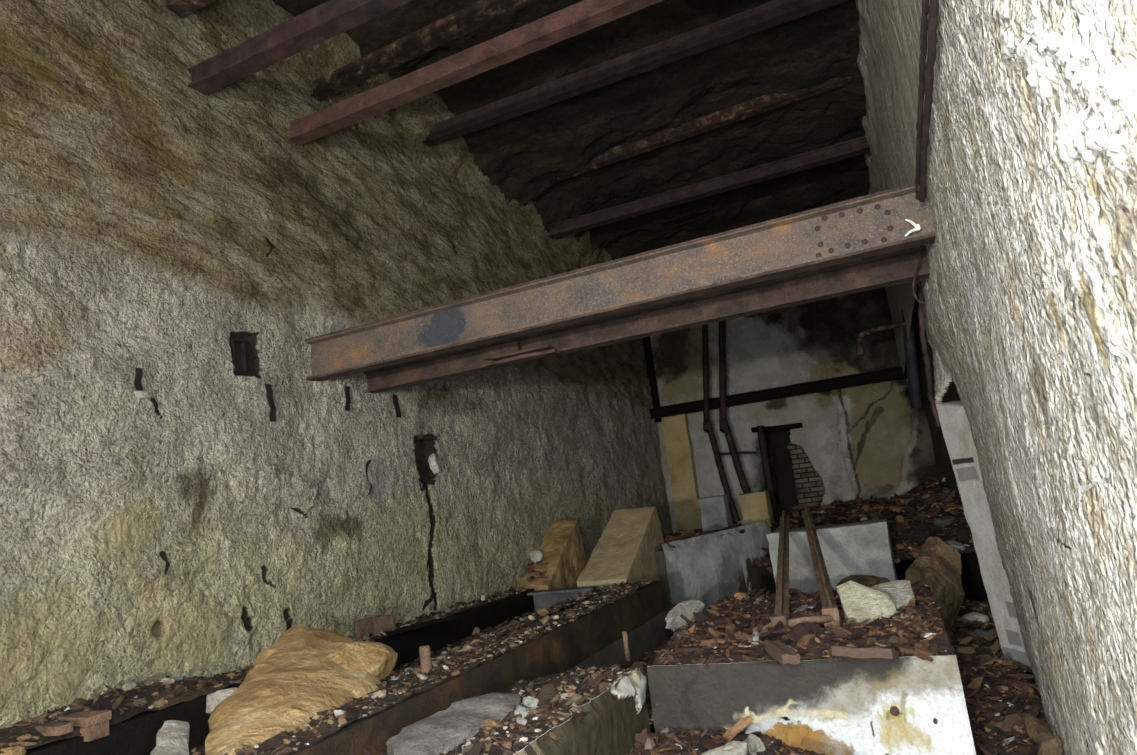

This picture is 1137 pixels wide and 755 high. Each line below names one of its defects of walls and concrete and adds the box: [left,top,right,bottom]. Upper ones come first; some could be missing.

water stain [993,0,1134,276]
peeling [726,317,817,410]
peeling [690,417,761,500]
spalling [787,381,911,507]
crack [837,380,893,499]
crack [418,478,437,610]
water stain [514,655,959,755]